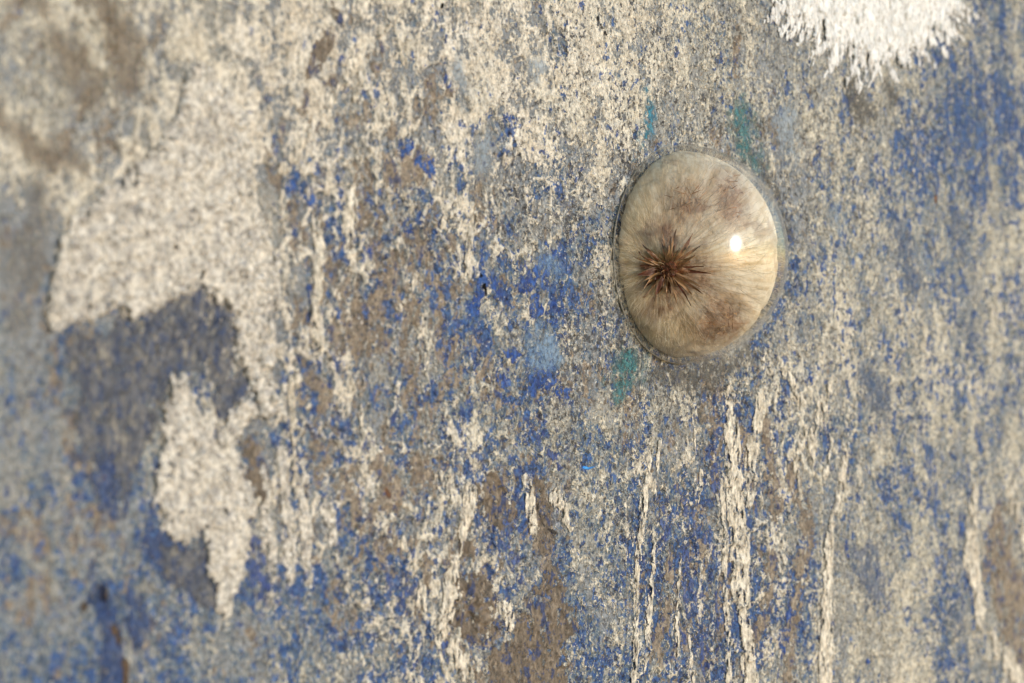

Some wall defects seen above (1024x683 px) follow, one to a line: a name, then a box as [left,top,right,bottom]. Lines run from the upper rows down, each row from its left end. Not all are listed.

spalling [296,0,436,195]
spalling [413,68,456,130]
damp [761,0,899,128]
damp [905,3,978,70]
spalling [473,196,488,244]
flaking render [43,57,437,620]
spalling [407,467,579,683]
spalling [649,544,674,677]
spalling [750,412,816,683]